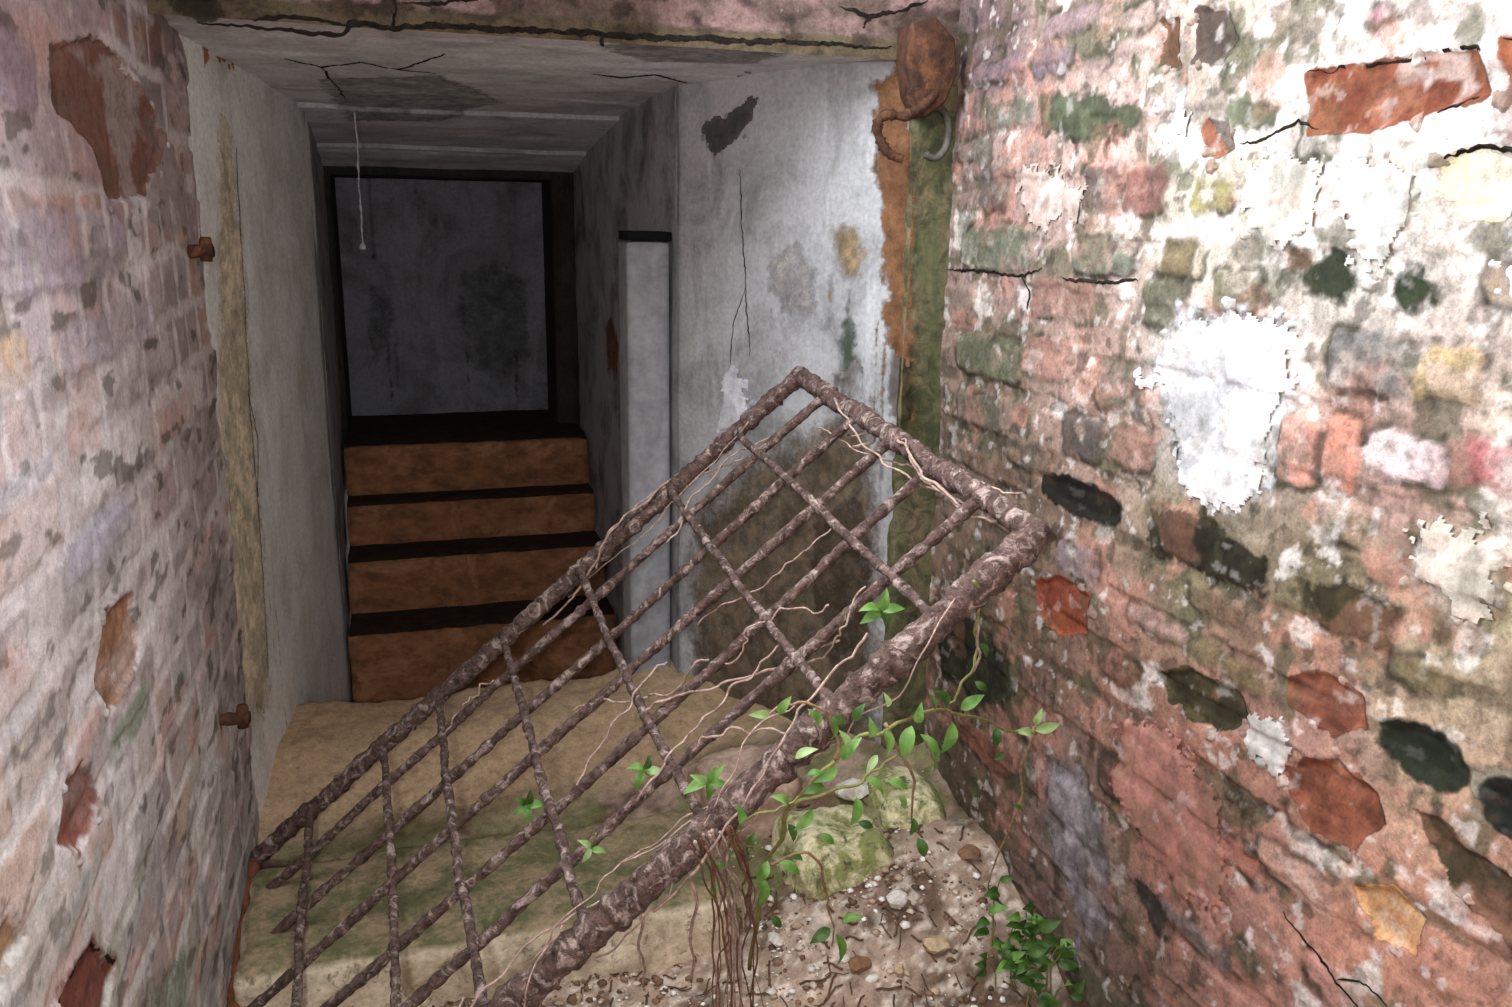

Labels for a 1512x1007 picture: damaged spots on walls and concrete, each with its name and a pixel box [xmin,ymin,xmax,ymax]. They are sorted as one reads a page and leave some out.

flaking render [49,33,170,215]
crack [197,0,928,99]
peeling [701,95,758,156]
rust [835,67,916,403]
spalling [1153,5,1512,293]
peeling [1488,259,1512,317]
peeling [1133,296,1299,516]
crack [1283,911,1387,1007]